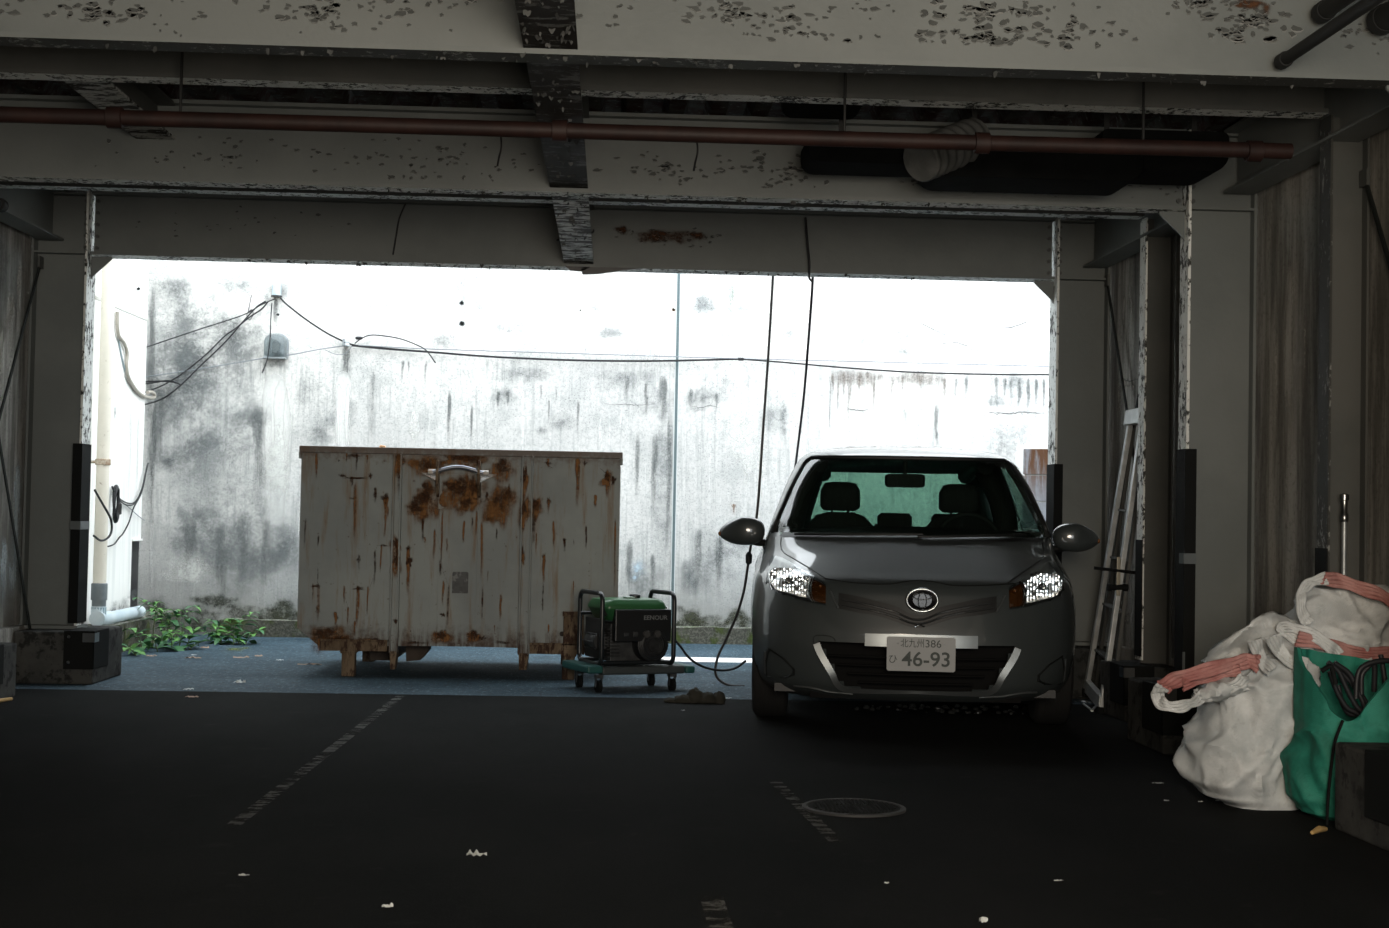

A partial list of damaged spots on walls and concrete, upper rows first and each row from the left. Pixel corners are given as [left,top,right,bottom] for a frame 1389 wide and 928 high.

peeling [0,0,207,53]
peeling [258,0,477,34]
peeling [672,0,895,43]
peeling [914,0,1138,52]
peeling [1166,0,1304,45]
damp [147,310,174,466]
damp [336,352,351,446]
damp [240,366,300,561]